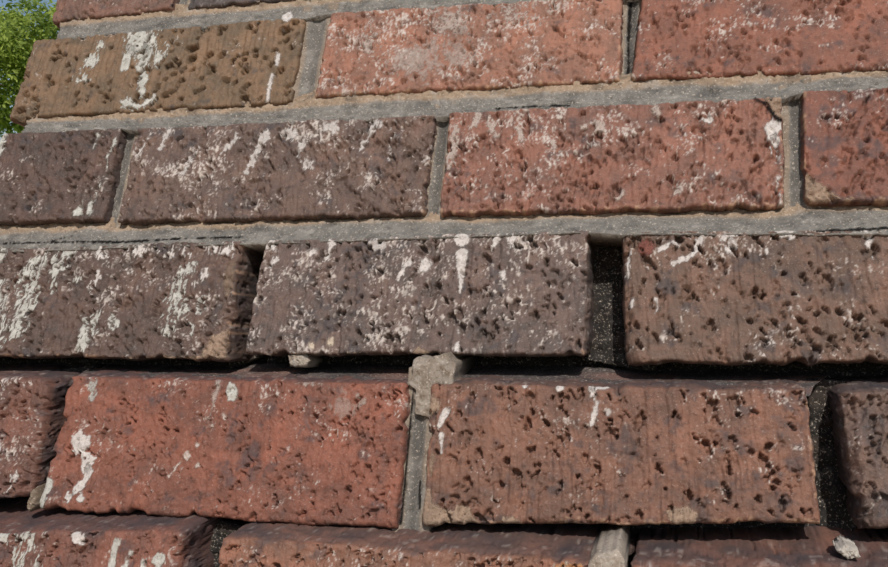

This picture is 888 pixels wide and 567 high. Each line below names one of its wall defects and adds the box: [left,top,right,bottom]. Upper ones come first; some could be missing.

spalling [422,486,479,526]